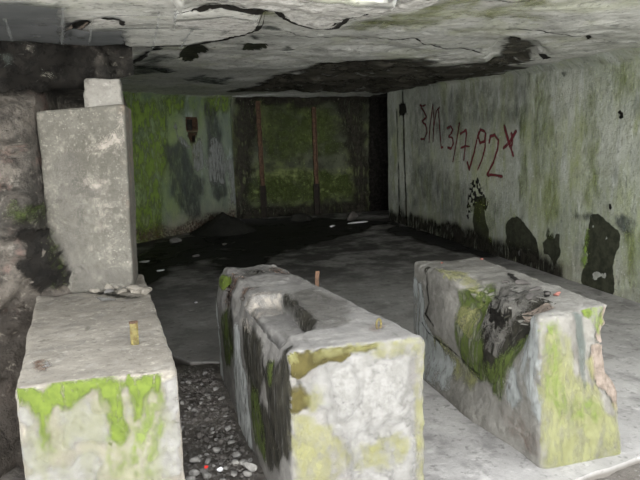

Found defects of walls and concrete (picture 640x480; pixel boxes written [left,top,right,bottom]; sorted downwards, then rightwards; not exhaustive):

crack [178,4,480,53]
water stain [136,92,562,285]
water stain [575,214,630,295]
crack [422,267,480,375]
spalling [589,306,618,414]
water stain [17,406,103,480]
water stain [59,398,110,449]
water stain [146,377,182,479]